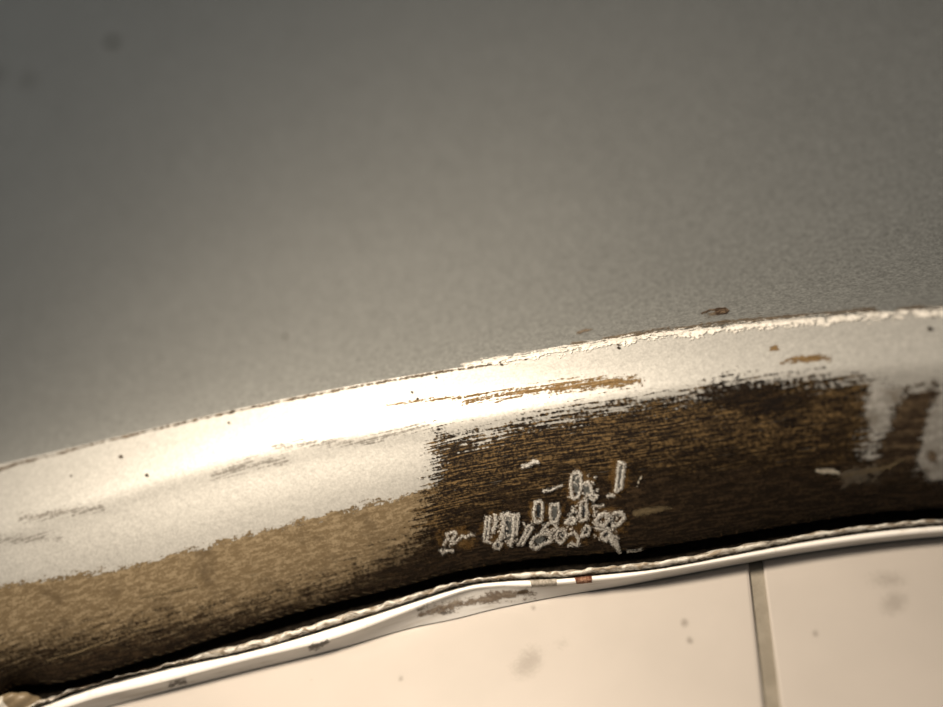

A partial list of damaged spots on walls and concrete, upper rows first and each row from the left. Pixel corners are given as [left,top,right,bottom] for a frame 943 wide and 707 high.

damp [864,386,907,441]
damp [917,385,943,481]
peeling [574,575,592,584]